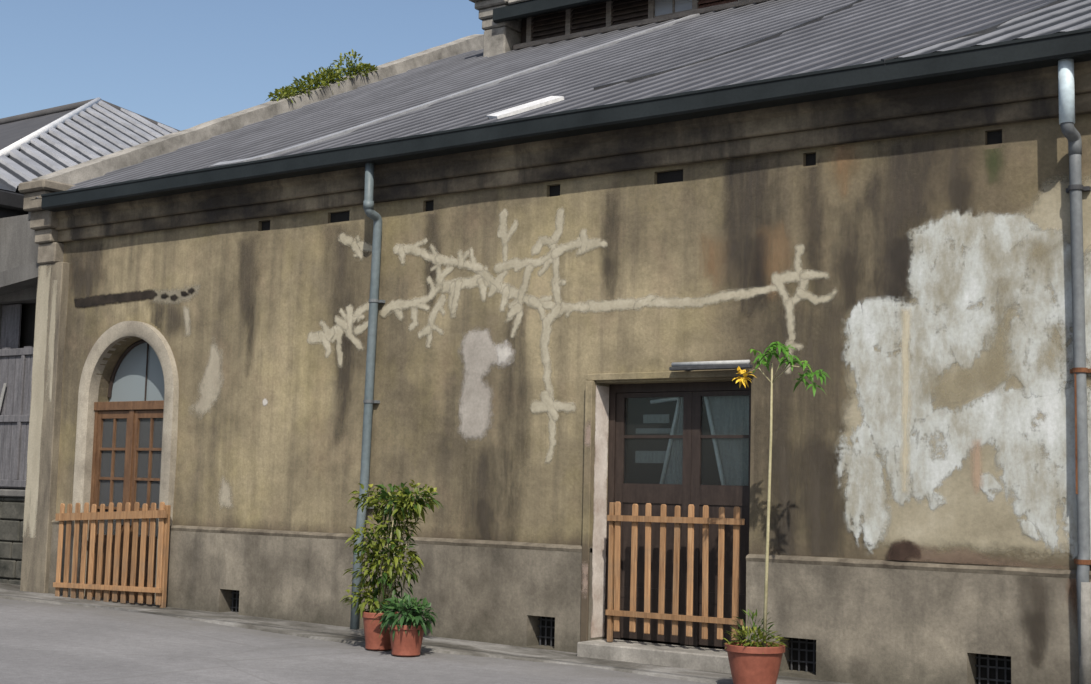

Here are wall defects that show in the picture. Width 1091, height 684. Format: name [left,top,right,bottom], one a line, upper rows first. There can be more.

peeling [496,345,512,364]
crack [307,208,836,463]
peeling [837,177,1091,569]